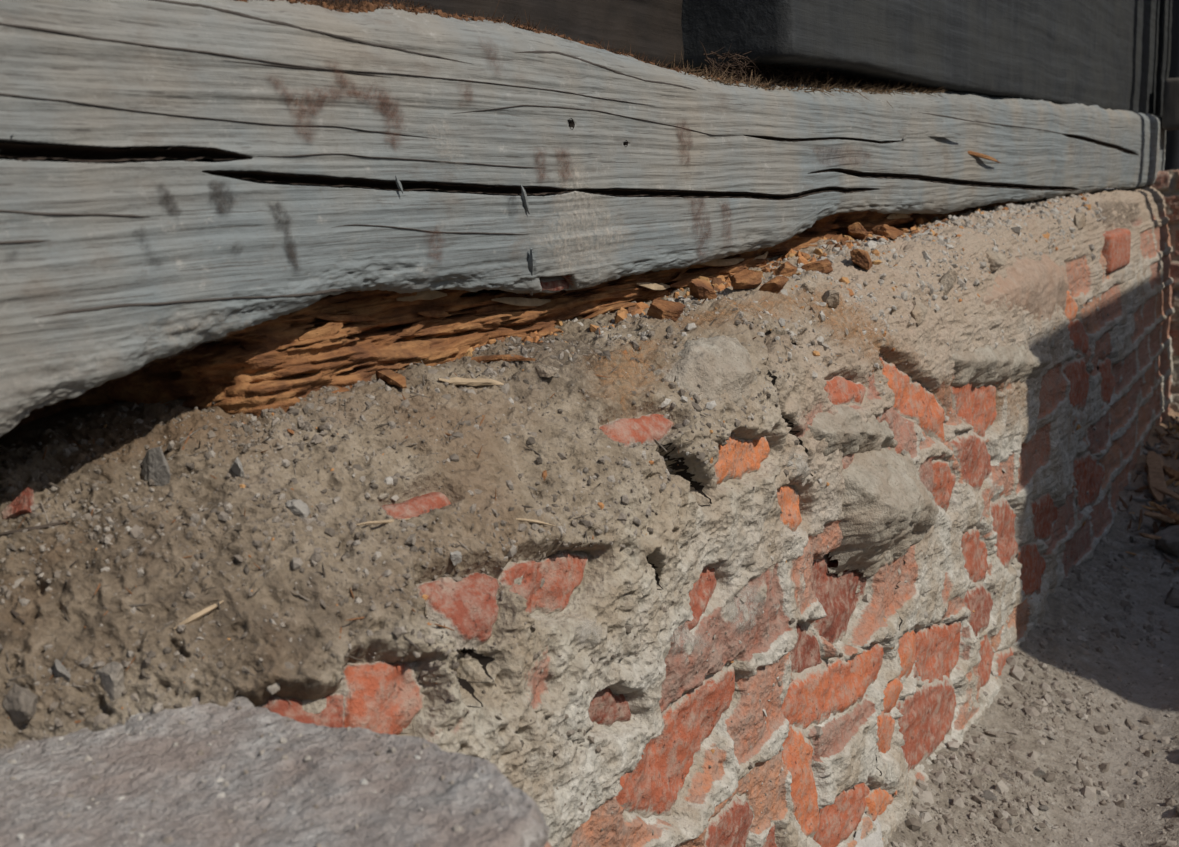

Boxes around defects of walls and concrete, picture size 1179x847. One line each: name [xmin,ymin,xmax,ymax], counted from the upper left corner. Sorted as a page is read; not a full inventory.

spalling [599,414,674,447]
crack [656,443,712,506]
spalling [713,435,770,485]
spalling [879,355,997,512]
spalling [777,485,802,532]
spalling [416,550,588,650]
spalling [685,566,717,631]
spalling [254,661,425,735]
spalling [588,687,631,727]
spalling [781,492,1058,847]
spalling [615,664,735,818]
spalling [704,793,753,847]